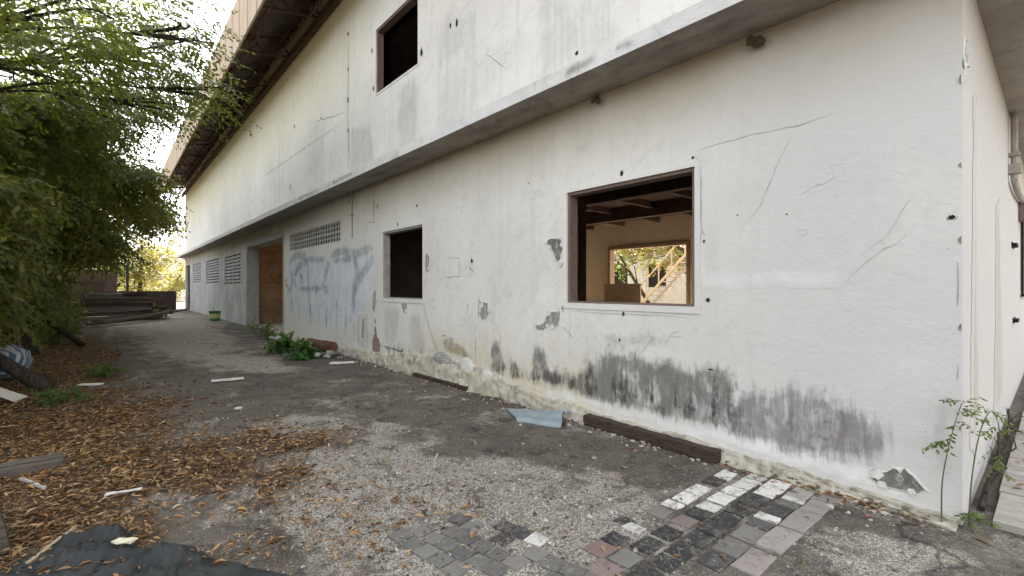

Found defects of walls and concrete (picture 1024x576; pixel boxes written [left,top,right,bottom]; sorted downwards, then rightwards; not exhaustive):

crack [697,112,836,231]
spalling [544,236,564,269]
spalling [534,308,562,331]
water stain [492,273,909,498]
spalling [867,465,930,497]